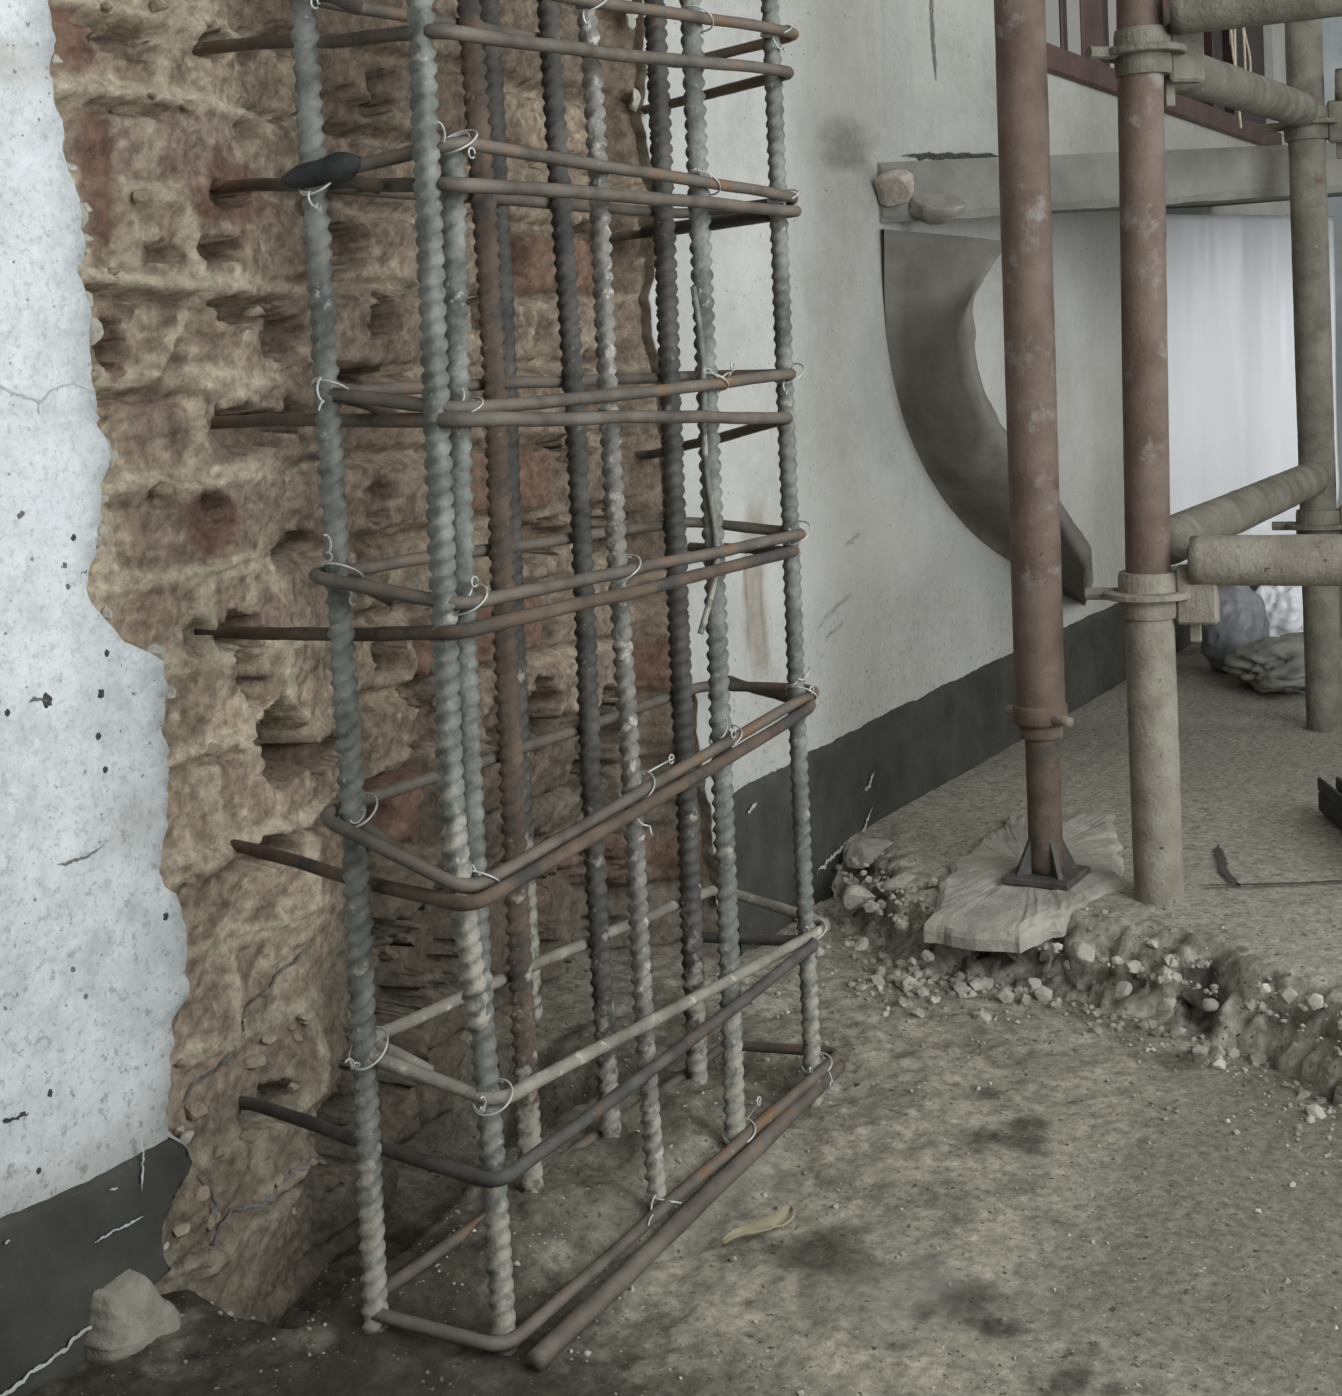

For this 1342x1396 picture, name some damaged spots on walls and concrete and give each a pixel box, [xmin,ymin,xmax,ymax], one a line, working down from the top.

spalling [315,0,416,178]
spalling [432,39,471,178]
spalling [501,47,549,183]
crack [0,383,89,415]
spalling [464,203,485,400]
spalling [509,206,583,845]
spalling [558,0,683,958]
spalling [30,692,53,709]
spalling [48,0,361,1328]
spalling [326,194,469,1226]
spalling [469,427,505,873]
spalling [535,851,591,990]